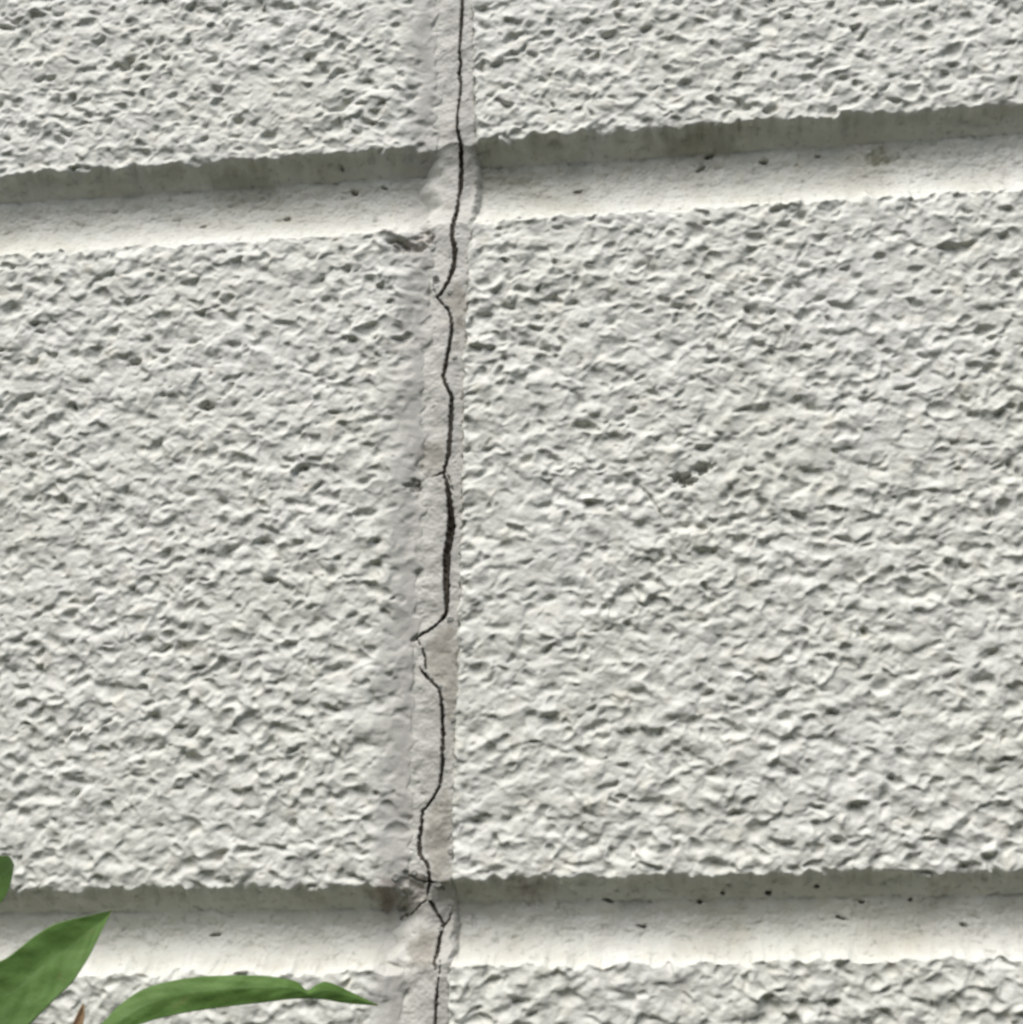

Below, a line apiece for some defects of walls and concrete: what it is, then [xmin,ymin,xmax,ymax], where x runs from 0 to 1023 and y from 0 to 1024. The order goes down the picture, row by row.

crack [407,0,464,1024]